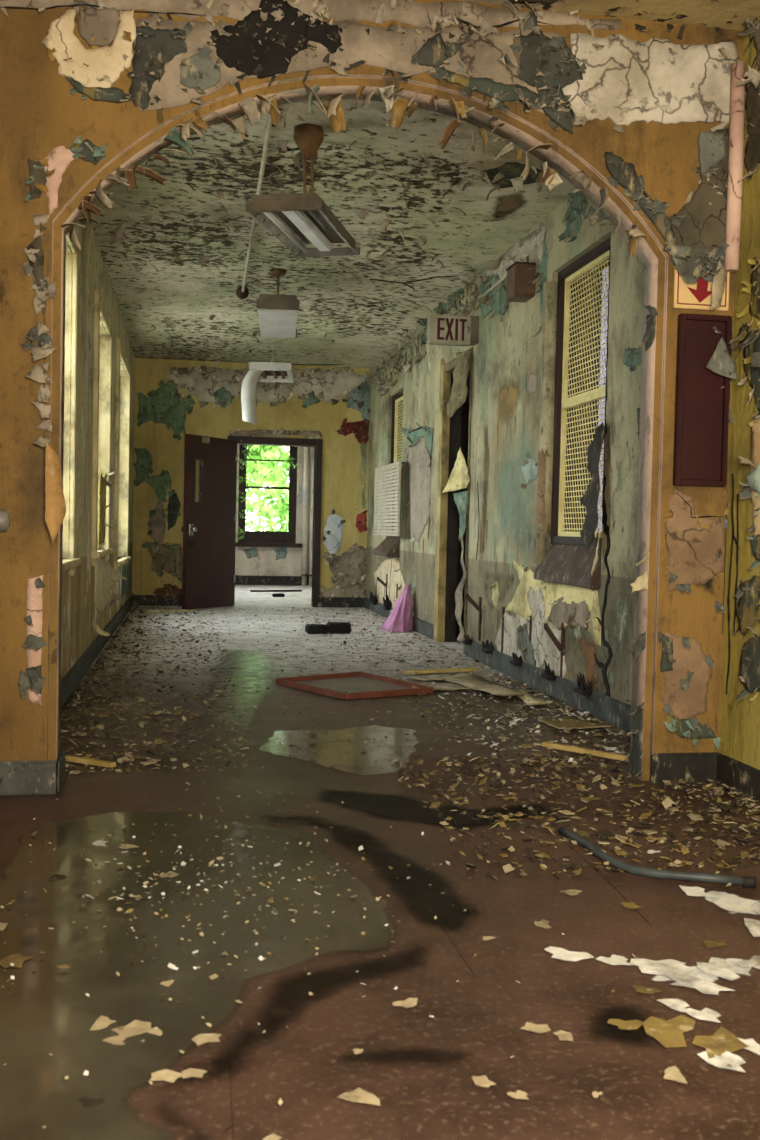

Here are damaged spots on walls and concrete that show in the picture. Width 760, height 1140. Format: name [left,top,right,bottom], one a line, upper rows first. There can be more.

spalling [0,0,760,705]
spalling [626,631,721,751]